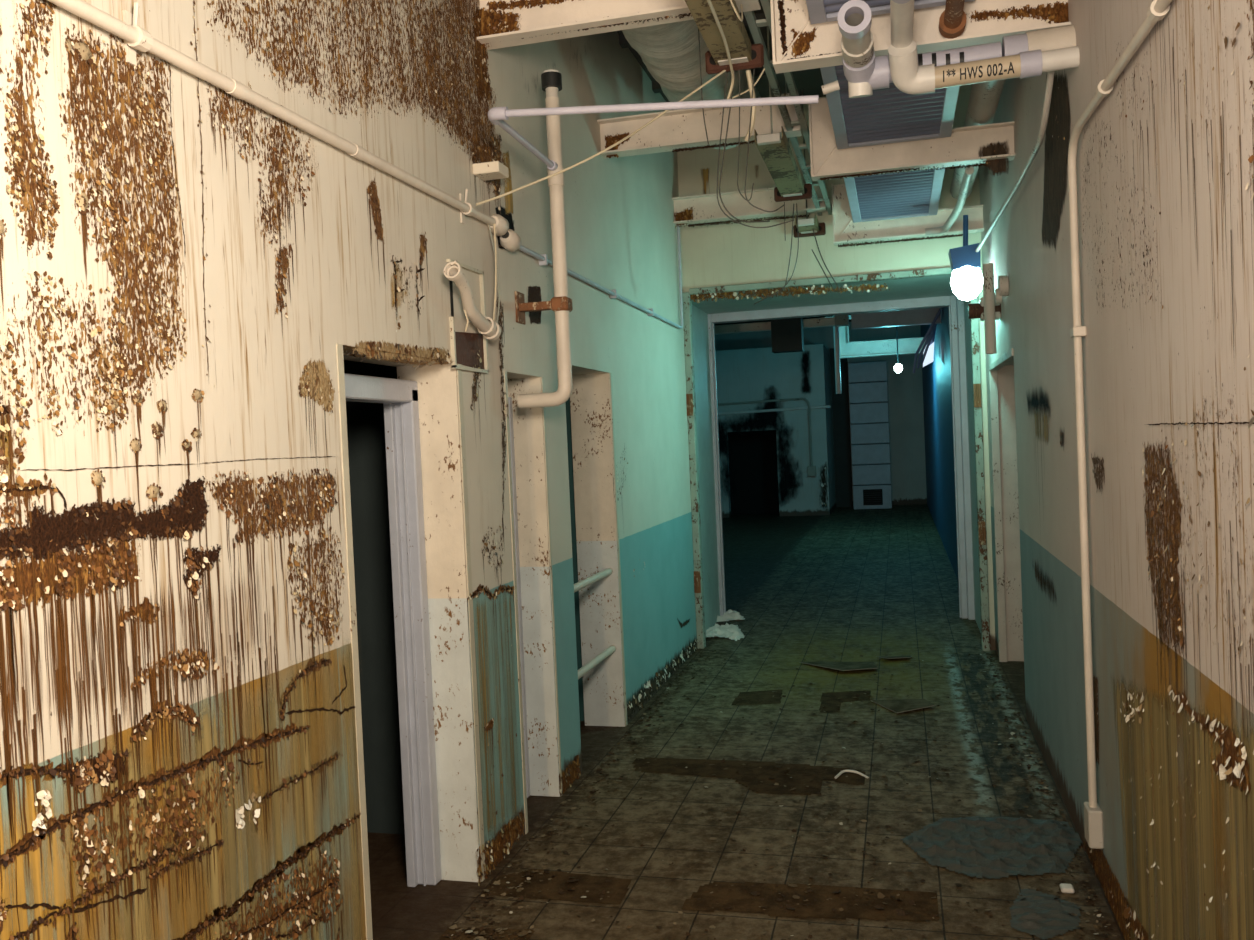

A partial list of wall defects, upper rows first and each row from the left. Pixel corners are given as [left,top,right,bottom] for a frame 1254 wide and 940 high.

corrosion [777,0,841,60]
corrosion [605,132,631,159]
peeling [0,0,188,483]
corrosion [0,405,55,531]
crack [1144,420,1254,428]
spalling [0,476,209,686]
corrosion [1142,437,1187,754]
peeling [1146,354,1254,933]
peeling [32,789,52,836]
crack [0,658,361,940]
peeling [236,792,261,832]
corrosion [476,808,525,886]